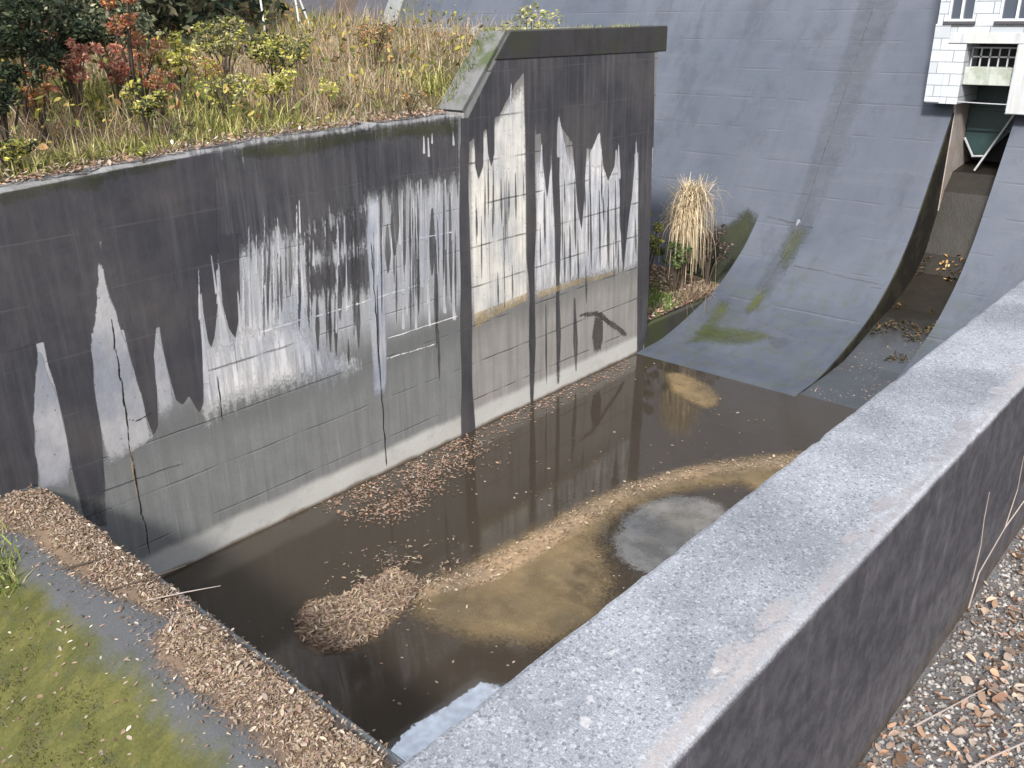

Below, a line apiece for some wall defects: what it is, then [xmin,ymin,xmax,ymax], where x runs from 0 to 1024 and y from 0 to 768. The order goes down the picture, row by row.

crack [111,319,151,554]
damp [0,52,654,519]
crack [371,245,387,466]